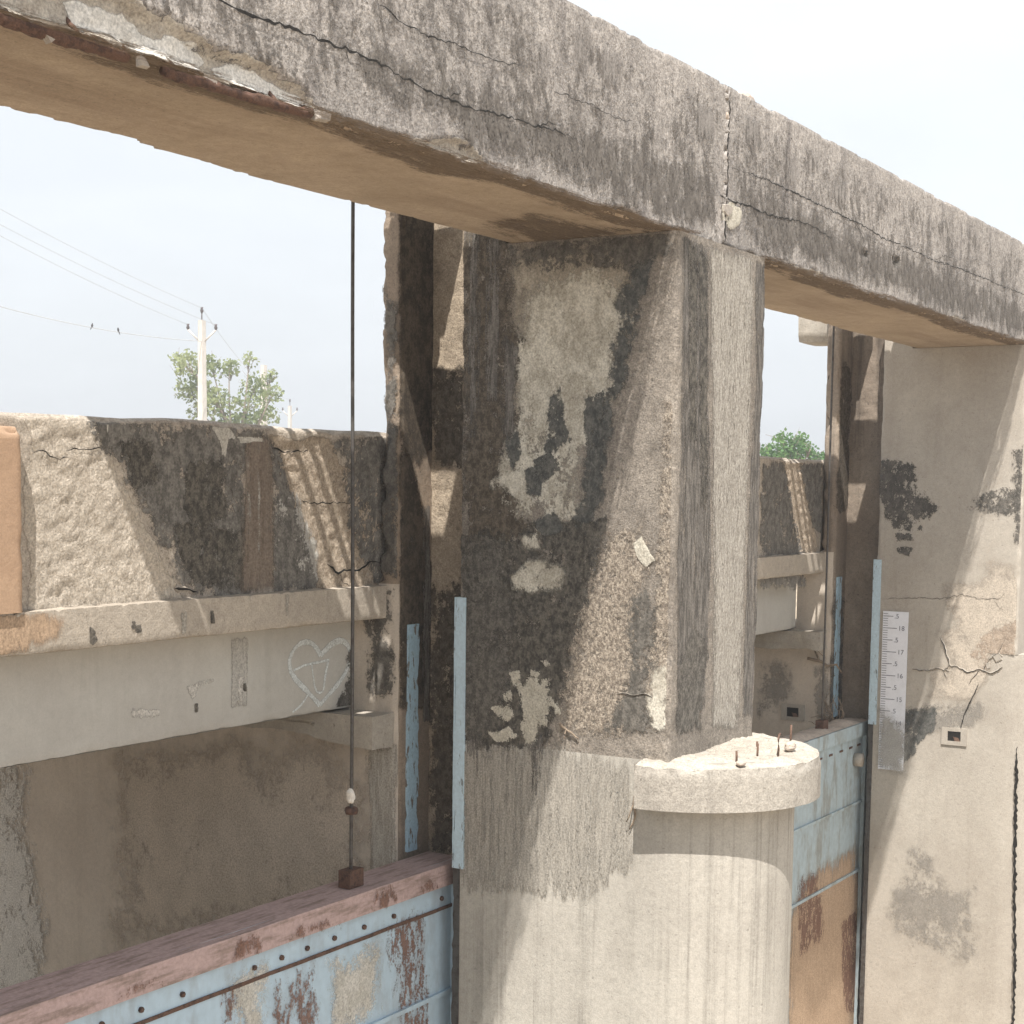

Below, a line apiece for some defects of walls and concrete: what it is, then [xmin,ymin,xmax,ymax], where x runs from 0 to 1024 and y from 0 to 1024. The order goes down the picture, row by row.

spalling [0,0,330,123]
crack [219,0,576,139]
crack [719,86,1024,295]
water stain [0,0,1024,730]
crack [34,447,102,460]
spalling [488,399,673,745]
crack [912,638,1003,738]
corrosion [273,969,319,1024]
corrosion [386,915,429,1024]
corrosion [797,873,825,955]
corrosion [841,912,857,1013]
crack [1011,747,1019,1024]